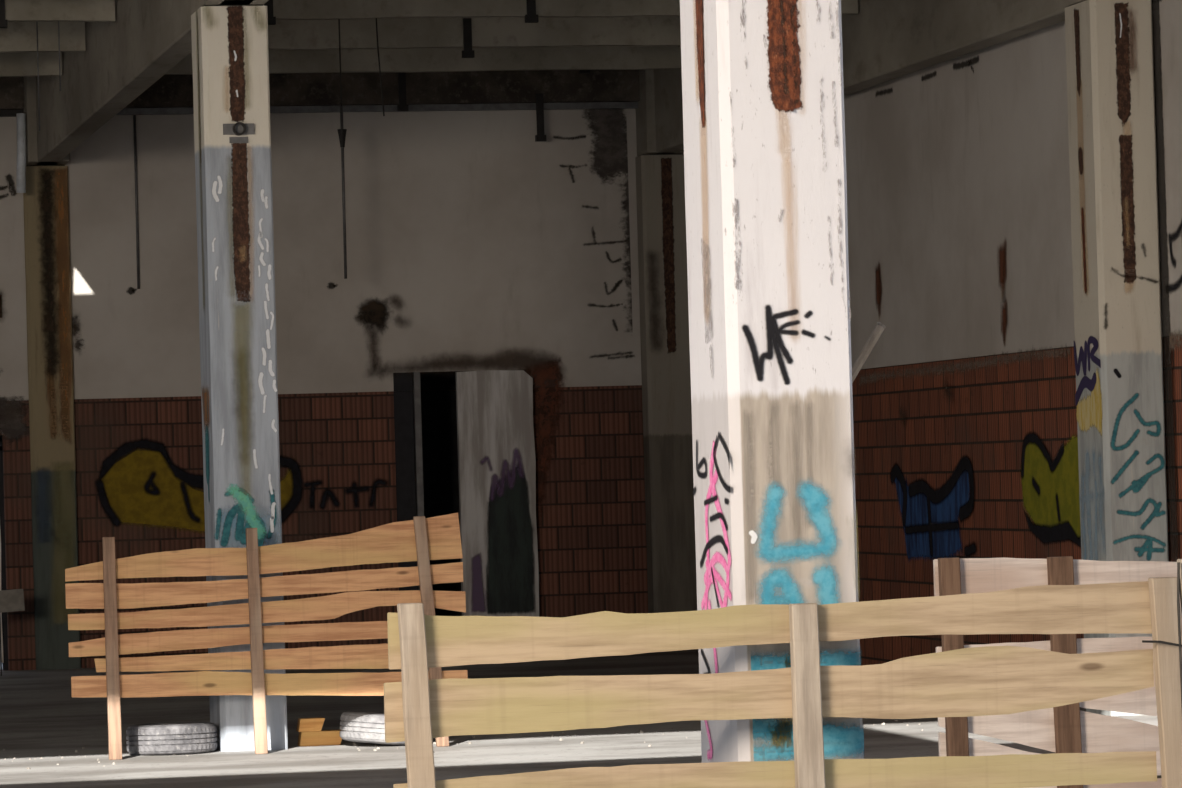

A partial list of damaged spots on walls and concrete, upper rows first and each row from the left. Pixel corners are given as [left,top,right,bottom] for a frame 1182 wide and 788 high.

rust [231,143,251,302]
rust [226,6,259,122]
rust [766,0,803,112]
rust [1114,2,1136,284]
rust [39,169,71,440]
damp [356,298,404,374]
peeling [0,397,29,443]
peeling [381,351,563,512]